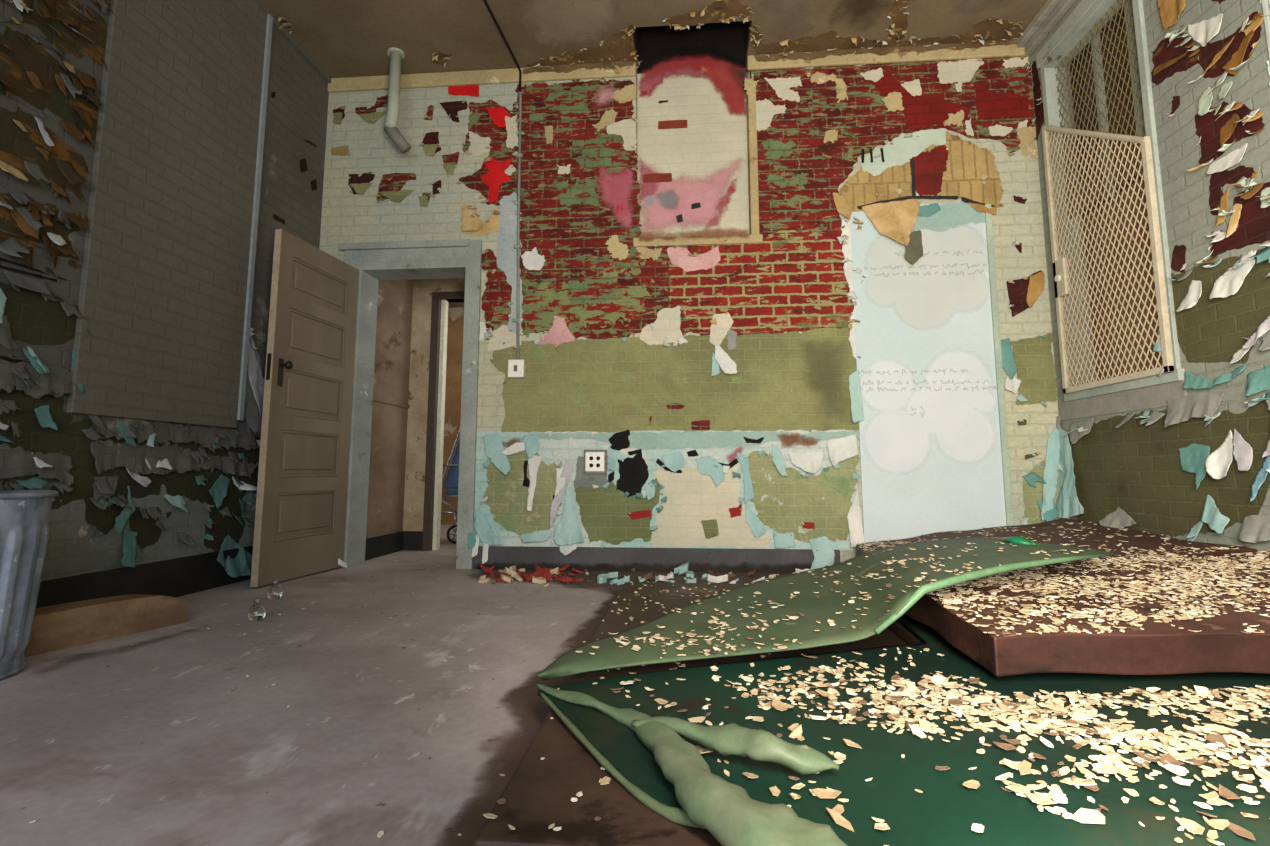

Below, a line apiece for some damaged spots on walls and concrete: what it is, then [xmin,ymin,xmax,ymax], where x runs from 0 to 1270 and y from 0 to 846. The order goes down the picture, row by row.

flaking render [333,95,388,125]
spalling [300,139,317,191]
peeling [331,145,350,156]
peeling [348,0,1270,845]